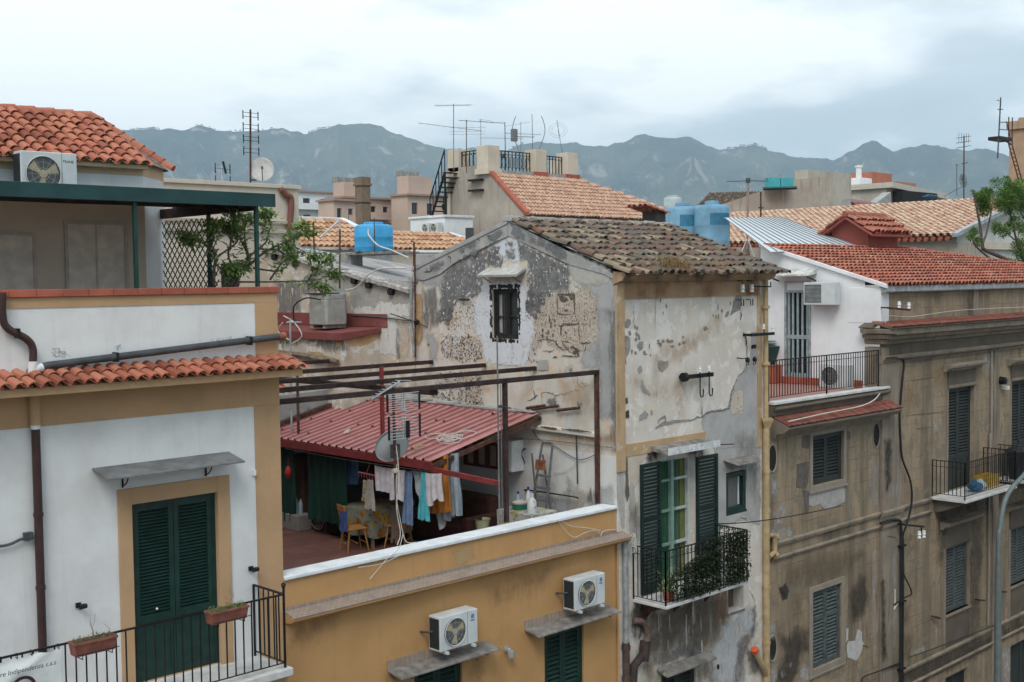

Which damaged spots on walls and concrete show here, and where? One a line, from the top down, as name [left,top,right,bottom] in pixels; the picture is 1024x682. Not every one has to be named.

peeling [279,235,598,405]
crack [528,339,588,402]
flaking render [625,319,686,396]
peeling [710,608,754,682]
leakage [851,558,908,660]